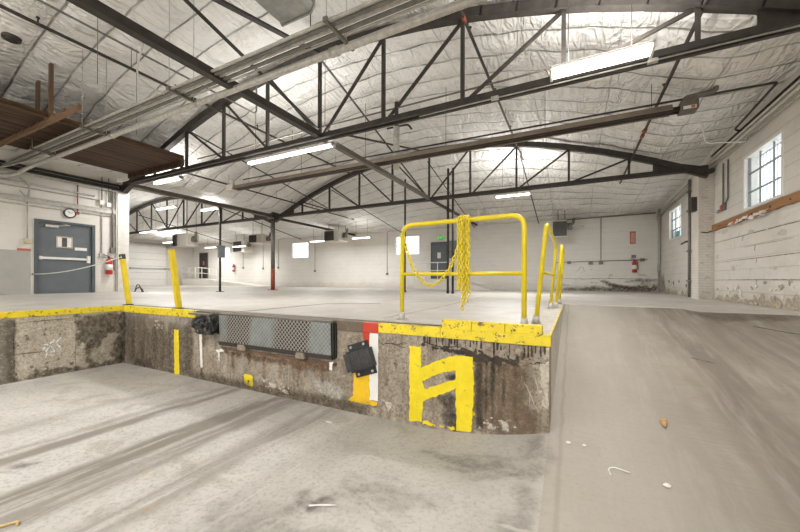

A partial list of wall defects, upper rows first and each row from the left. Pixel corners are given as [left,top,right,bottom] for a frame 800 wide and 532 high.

spalling [700,266,800,311]
leakage [74,312,365,415]
leakage [421,336,546,435]